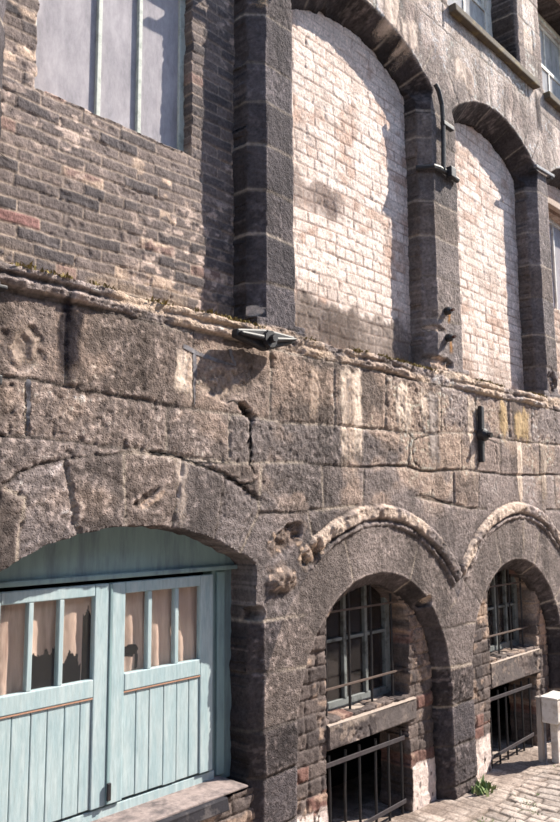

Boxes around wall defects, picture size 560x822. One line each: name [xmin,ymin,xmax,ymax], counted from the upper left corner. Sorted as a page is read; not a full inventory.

crack [150,400,257,497]
peeling [413,757,436,812]
peeling [297,806,328,822]